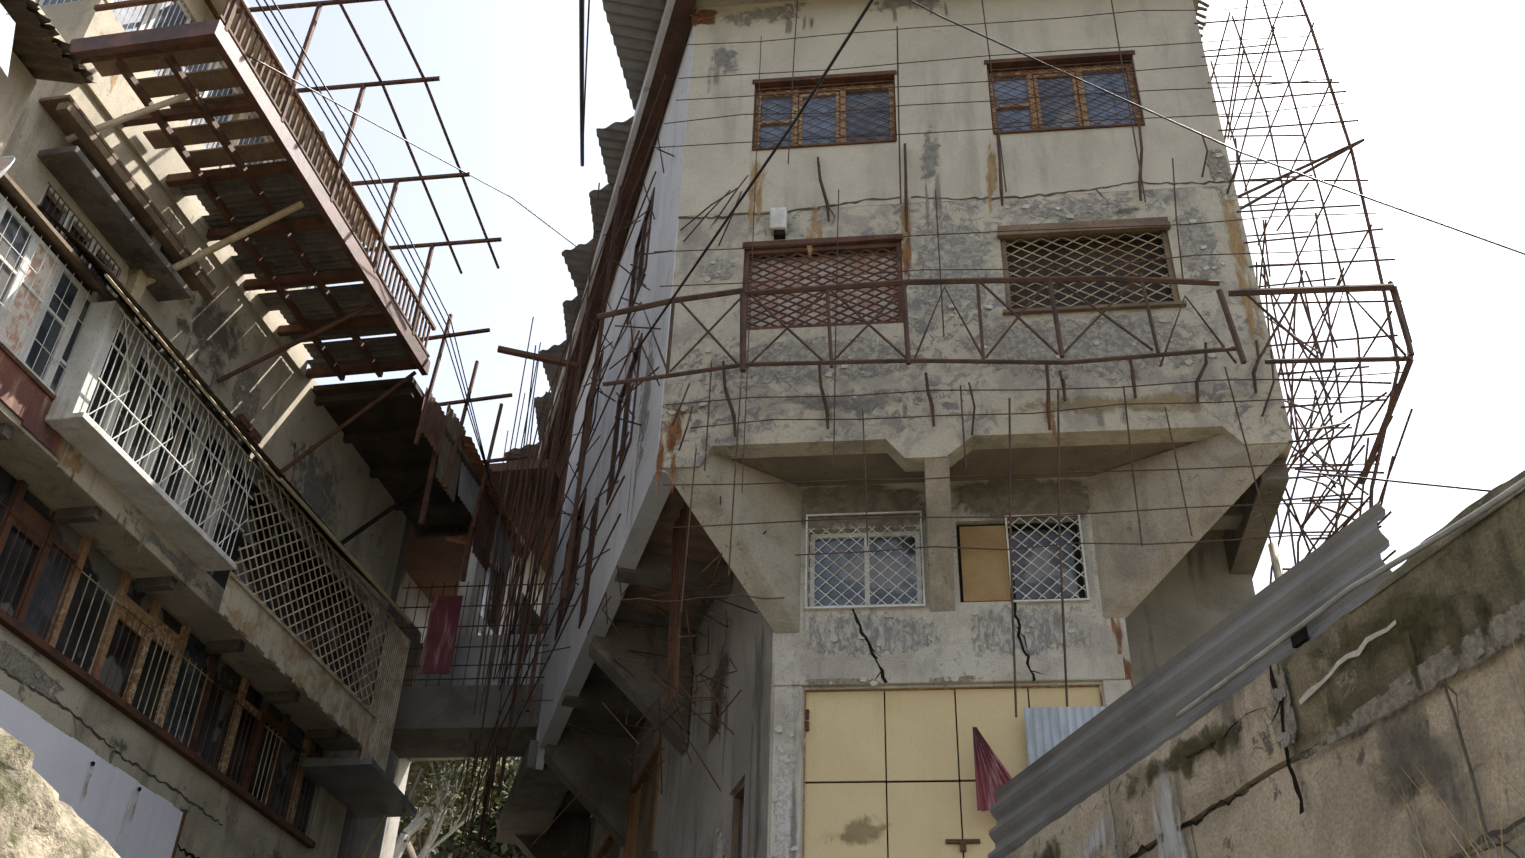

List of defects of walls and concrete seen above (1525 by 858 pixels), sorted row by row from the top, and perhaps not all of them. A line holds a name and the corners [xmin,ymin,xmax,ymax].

peeling [1006,197,1131,220]
peeling [1173,207,1225,282]
corrosion [0,349,82,482]
crack [852,609,888,683]
crack [1014,602,1042,681]
crack [0,666,223,826]
crack [1442,680,1459,738]
crack [178,844,200,858]